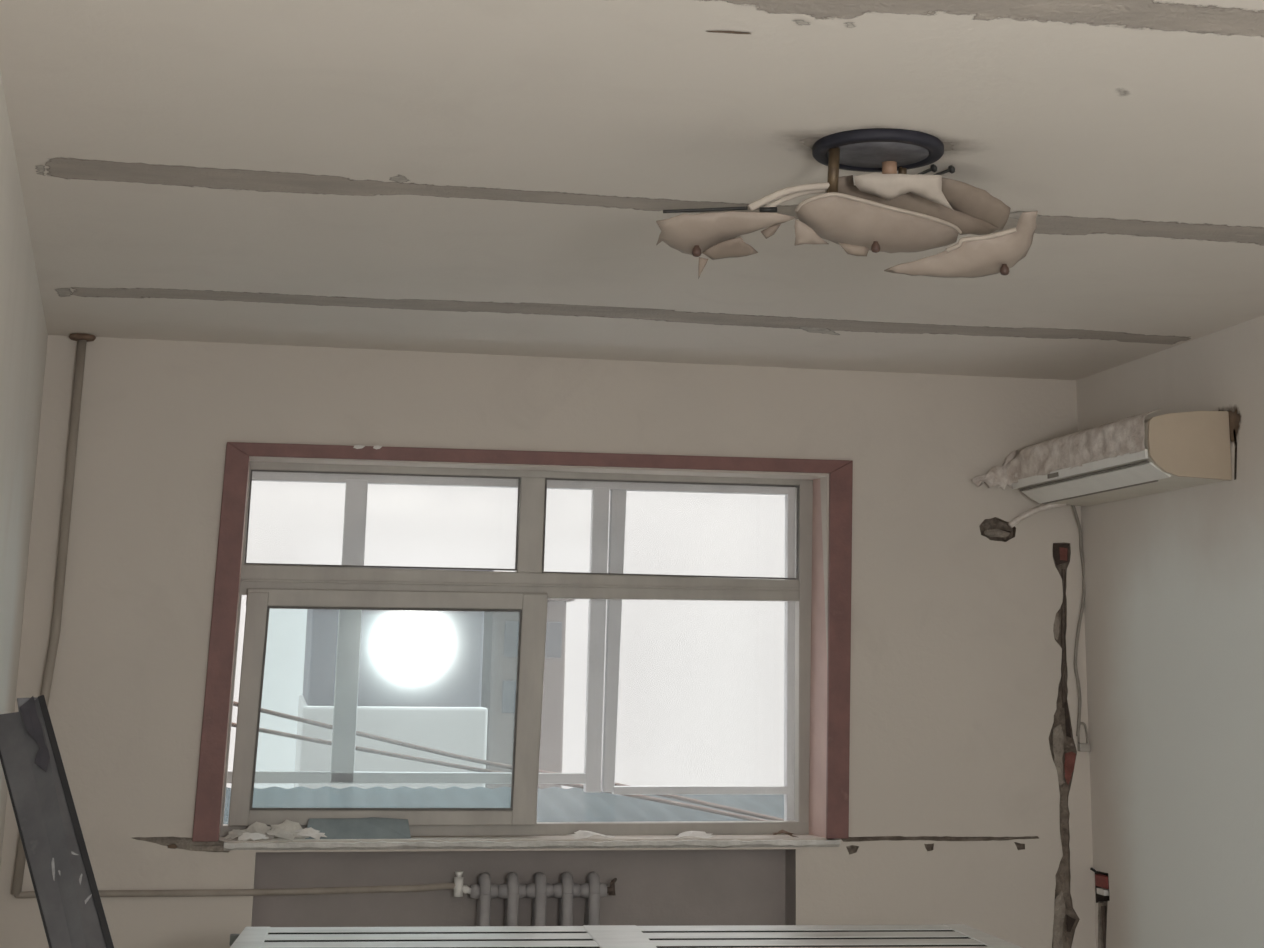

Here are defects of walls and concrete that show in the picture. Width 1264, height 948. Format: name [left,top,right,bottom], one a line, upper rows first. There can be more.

peeling [705,0,1264,37]
peeling [36,158,798,219]
peeling [992,211,1264,245]
peeling [55,287,1191,344]
spalling [1053,543,1069,565]